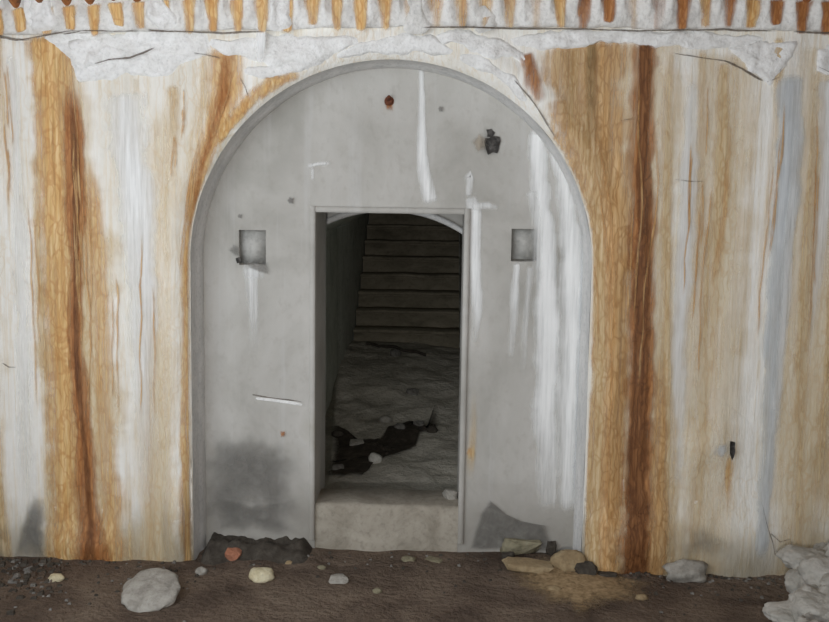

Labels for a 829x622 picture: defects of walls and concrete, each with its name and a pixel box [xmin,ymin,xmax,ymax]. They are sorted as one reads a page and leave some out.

leakage [23,0,798,102]
crack [427,25,767,33]
crack [676,53,779,80]
corrosion [770,0,784,25]
corrosion [796,1,812,31]
crack [796,28,829,36]
corrosion [30,31,131,561]
leakage [113,95,156,412]
corrosion [180,52,295,561]
leakage [467,172,492,330]
leakage [511,131,583,506]
corrosion [523,42,671,575]